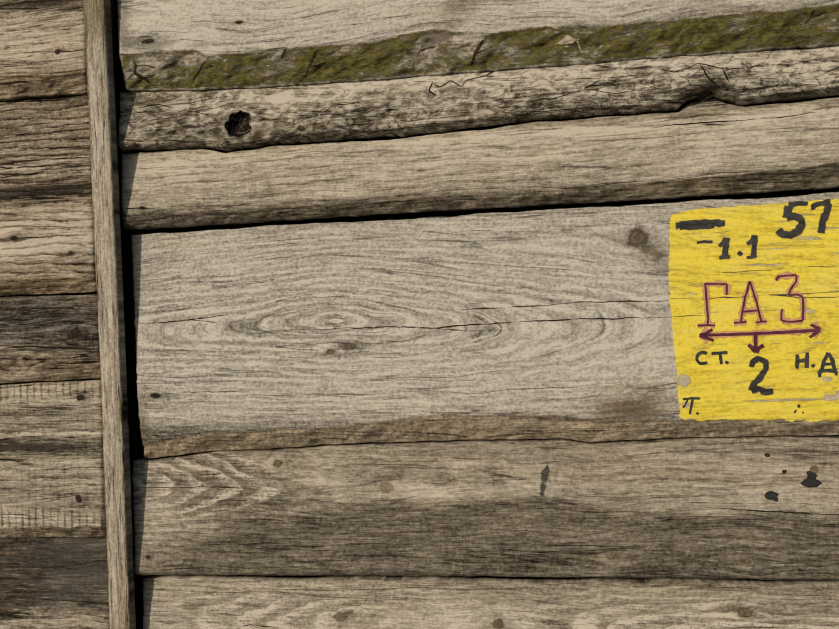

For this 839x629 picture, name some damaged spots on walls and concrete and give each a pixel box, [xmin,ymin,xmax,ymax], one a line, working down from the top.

crack [412,40,494,96]